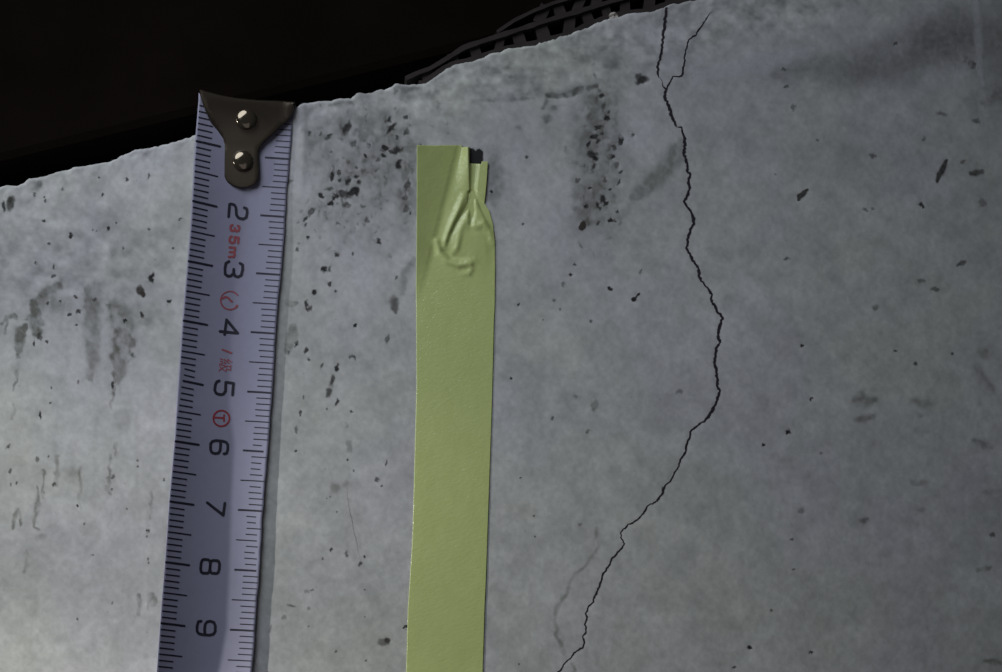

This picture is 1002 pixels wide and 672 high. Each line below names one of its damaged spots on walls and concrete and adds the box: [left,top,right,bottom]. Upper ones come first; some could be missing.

leakage [16,292,46,342]
crack [557,7,724,672]